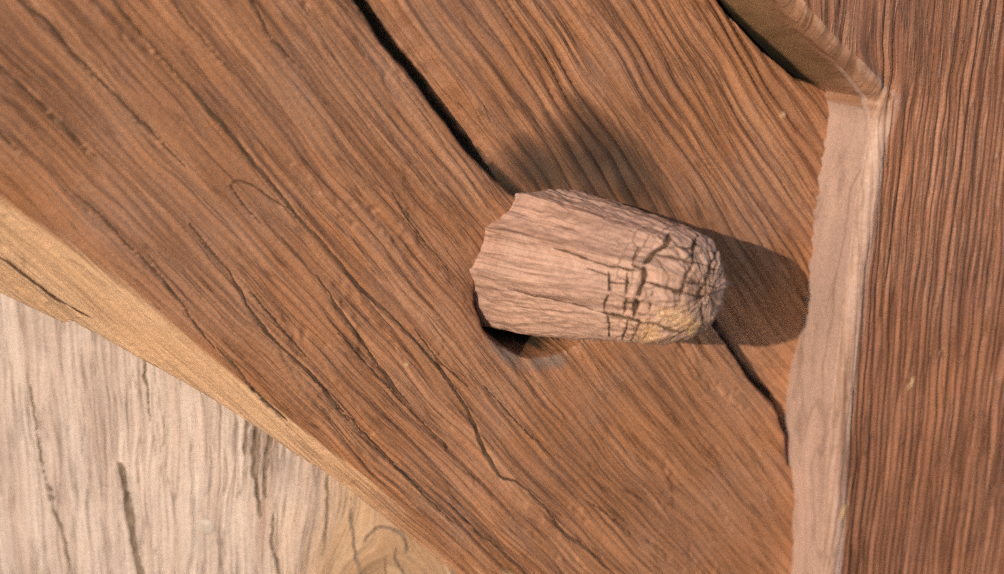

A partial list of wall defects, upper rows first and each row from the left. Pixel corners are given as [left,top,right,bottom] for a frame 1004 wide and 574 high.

crack [71,190,287,574]
crack [112,0,614,574]
crack [507,233,720,341]